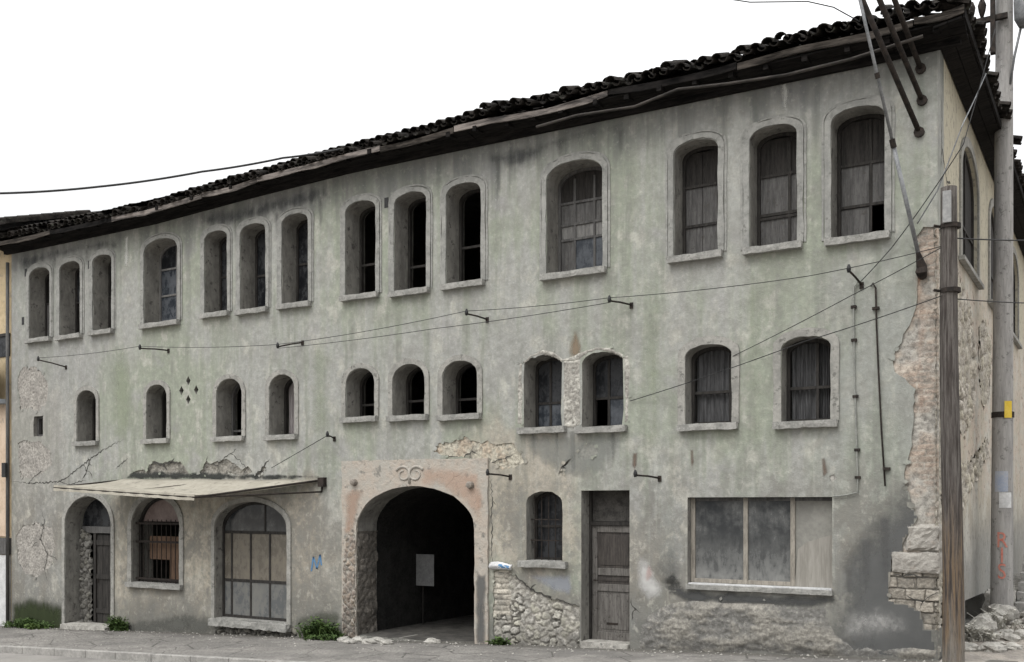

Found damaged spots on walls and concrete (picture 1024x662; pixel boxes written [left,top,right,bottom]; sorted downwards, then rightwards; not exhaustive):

flaking render [517,346,631,428]
flaking render [958,277,992,439]
crack [13,440,269,485]
flaking render [131,459,266,477]
peeling [432,435,528,470]
spalling [887,224,942,632]
flaking render [961,437,990,511]
peeling [17,521,55,579]
flaking render [491,570,580,647]
leakage [847,506,934,655]